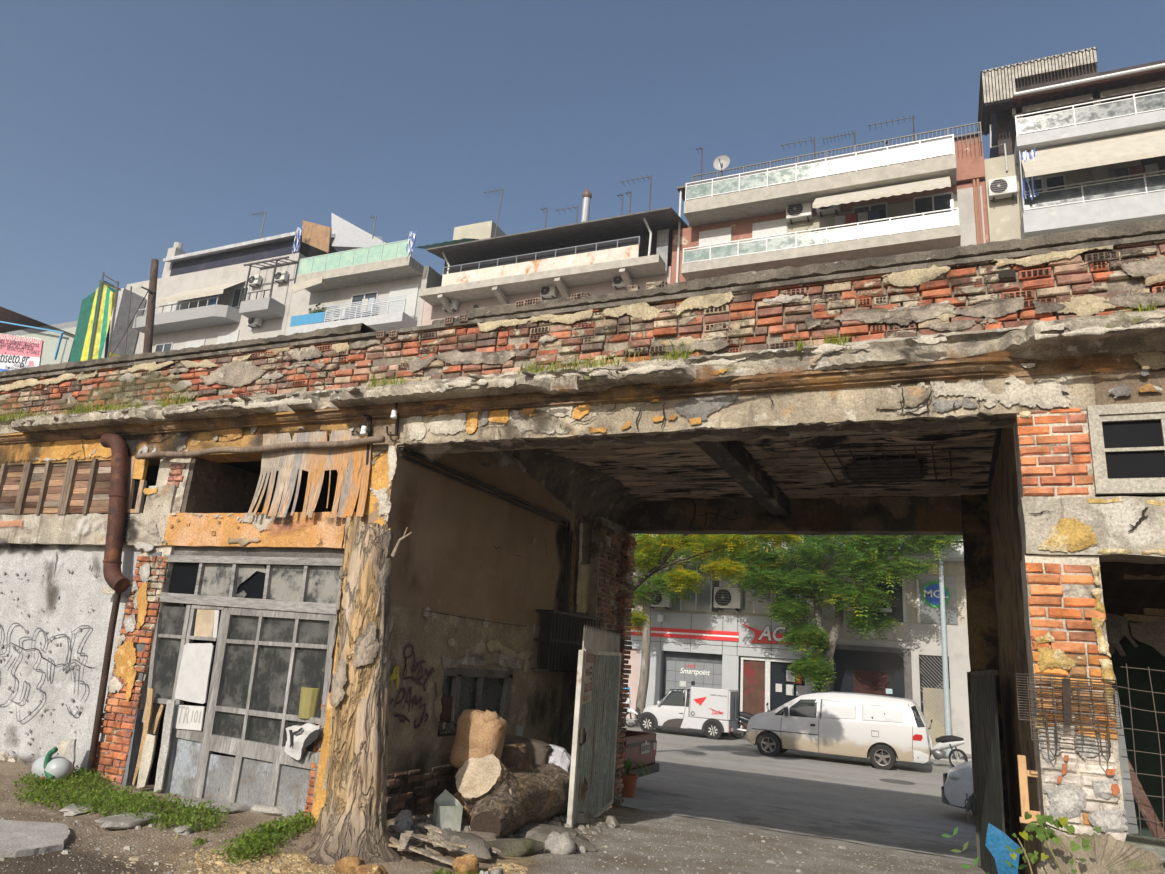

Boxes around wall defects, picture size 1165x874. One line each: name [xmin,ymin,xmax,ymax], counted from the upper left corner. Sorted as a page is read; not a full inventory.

flaking render [477,287,733,332]
flaking render [804,297,1165,340]
flaking render [994,241,1113,278]
flaking render [1080,255,1165,309]
flaking render [126,346,325,413]
flaking render [408,347,749,402]
flaking render [887,363,1073,418]
flaking render [348,398,607,522]
crack [1128,507,1148,532]
water stain [47,568,56,608]
peeling [109,512,293,701]
flaking render [1038,517,1165,722]